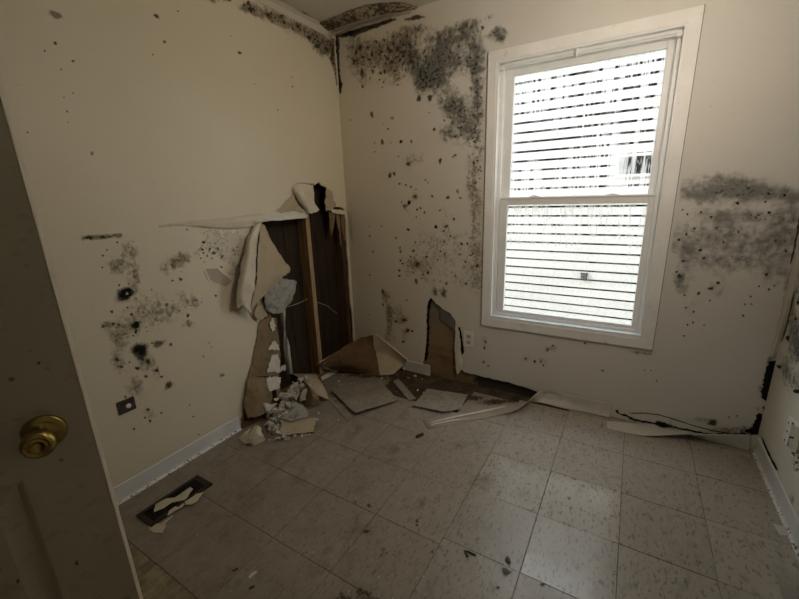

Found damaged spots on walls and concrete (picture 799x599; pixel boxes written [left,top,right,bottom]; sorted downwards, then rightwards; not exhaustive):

damp [240,1,505,296]
mould [83,234,135,259]
mould [678,175,799,266]
mould [102,260,203,390]
hole [277,219,312,390]
flaking render [422,298,464,361]
crack [616,410,753,435]